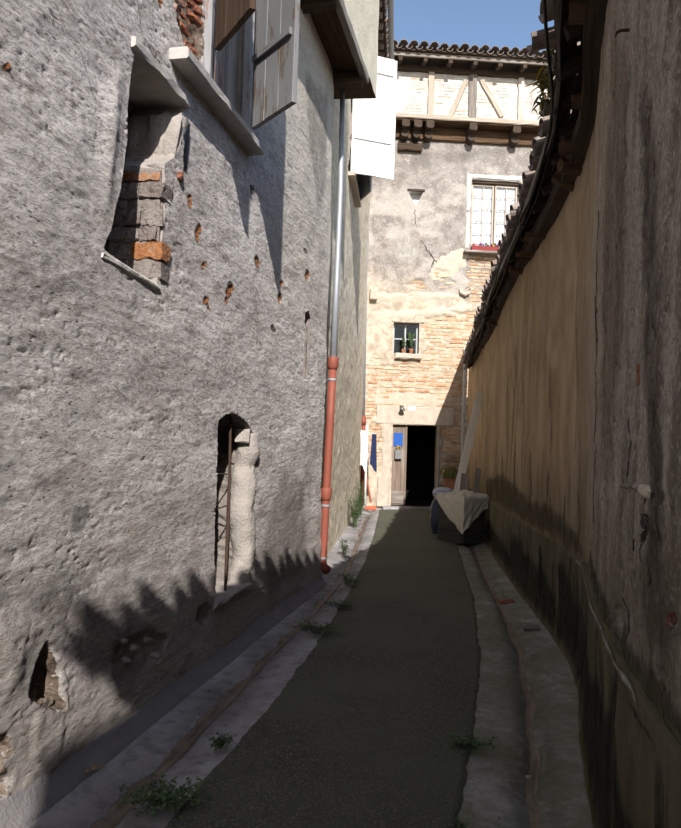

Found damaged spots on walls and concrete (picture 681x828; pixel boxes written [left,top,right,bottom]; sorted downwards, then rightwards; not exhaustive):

spalling [174,0,205,59]
spalling [224,281,234,304]
peeling [429,248,469,280]
spalling [28,644,65,711]
spalling [111,630,169,687]
leakage [486,453,681,828]
spalling [0,735,15,795]